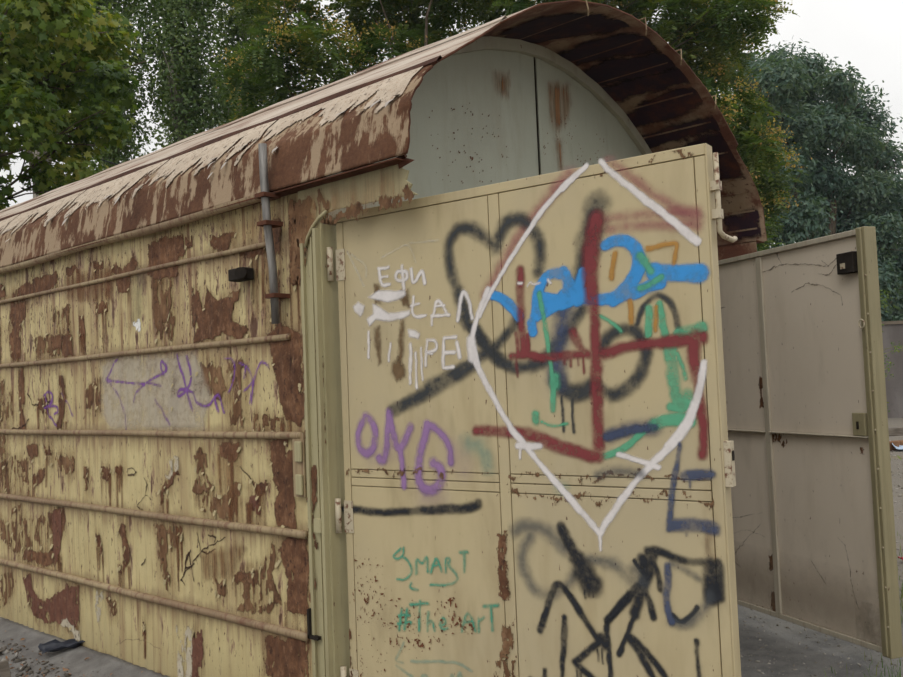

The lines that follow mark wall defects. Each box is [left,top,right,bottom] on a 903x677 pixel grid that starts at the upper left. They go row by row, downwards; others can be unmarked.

rust [499,13,746,180]
peeling [0,66,423,241]
rust [723,208,761,240]
crack [764,258,843,305]
peeling [226,357,285,439]
peeling [0,379,48,553]
peeling [153,523,177,591]
peeling [214,541,282,615]
rust [353,559,474,652]
rust [496,530,511,601]
rust [263,635,309,677]
rust [494,624,517,677]